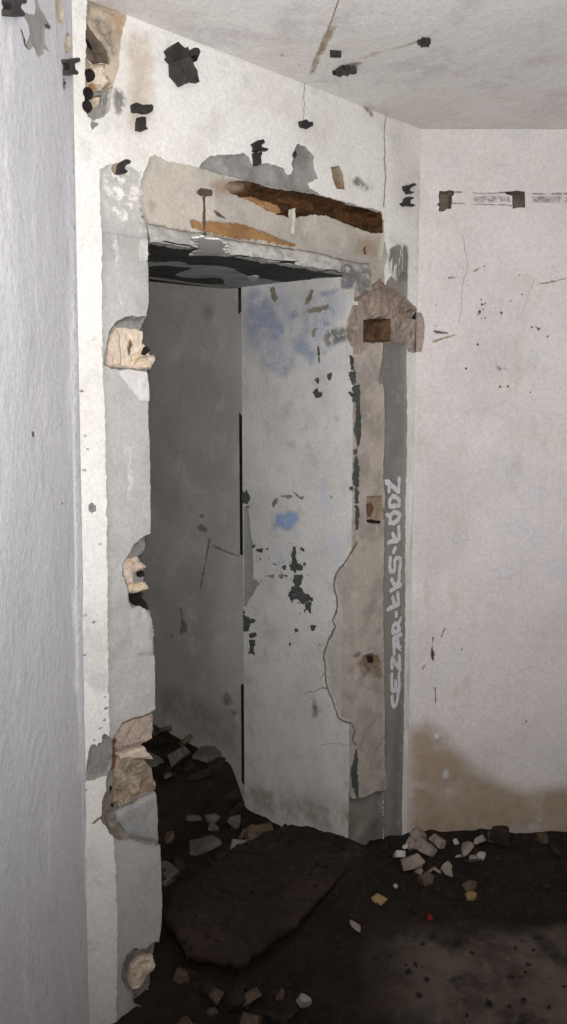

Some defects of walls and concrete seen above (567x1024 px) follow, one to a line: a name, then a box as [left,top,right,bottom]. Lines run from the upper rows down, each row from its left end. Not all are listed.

rust [191,188,295,249]
spalling [86,144,486,1021]
crack [305,541,386,756]
damp [415,731,567,832]